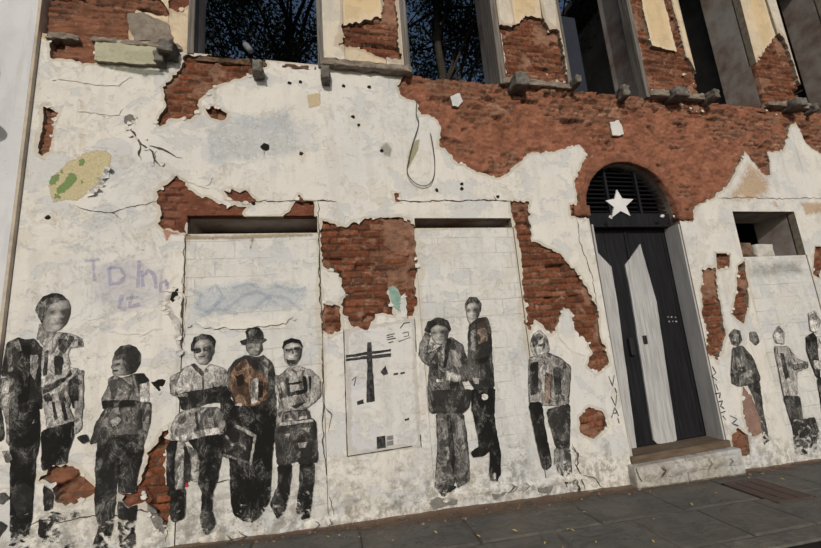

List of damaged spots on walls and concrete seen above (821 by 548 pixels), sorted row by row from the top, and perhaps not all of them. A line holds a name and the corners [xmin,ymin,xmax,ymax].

spalling [45,0,189,86]
spalling [342,0,401,60]
crack [124,121,180,166]
spalling [154,57,252,126]
spalling [398,0,821,222]
spalling [157,174,256,236]
spalling [319,218,420,337]
spalling [510,201,607,374]
spalling [700,253,750,360]
spalling [579,407,609,438]
spalling [42,465,95,504]
spalling [116,426,172,534]